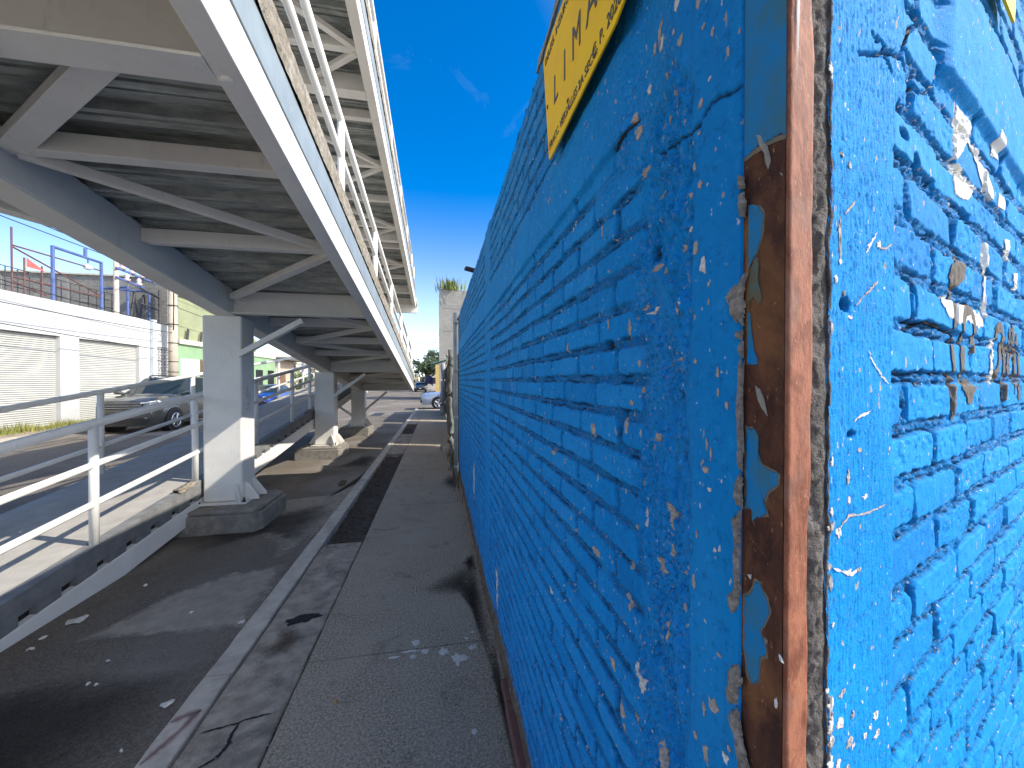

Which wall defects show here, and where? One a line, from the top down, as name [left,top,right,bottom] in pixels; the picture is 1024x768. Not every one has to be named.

peeling [654,18,684,56]
crack [616,120,641,151]
peeling [631,112,644,141]
crack [661,88,740,155]
peeling [683,226,710,305]
spalling [738,0,879,768]
peeling [702,175,778,768]
damp [82,472,366,640]
damp [444,557,483,638]
crack [198,713,271,768]
damp [492,656,516,766]
peeling [635,662,649,696]